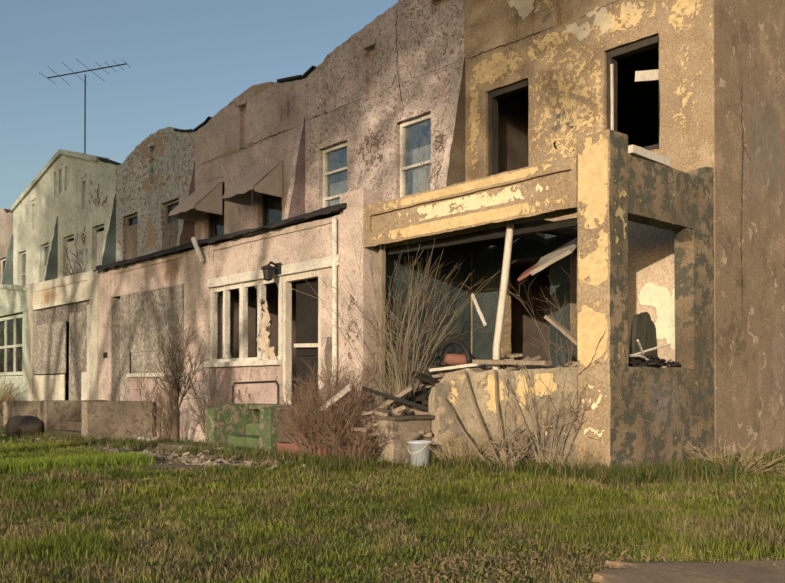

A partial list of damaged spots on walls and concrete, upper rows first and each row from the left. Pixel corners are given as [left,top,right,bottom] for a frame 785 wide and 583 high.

crack [201,10,555,181]
peeling [125,131,171,195]
peeling [374,0,703,286]
peeling [577,300,608,367]
peeling [638,283,675,349]
spalling [435,381,466,451]
peeling [483,374,505,413]
peeling [515,373,557,409]
peeling [582,384,606,410]